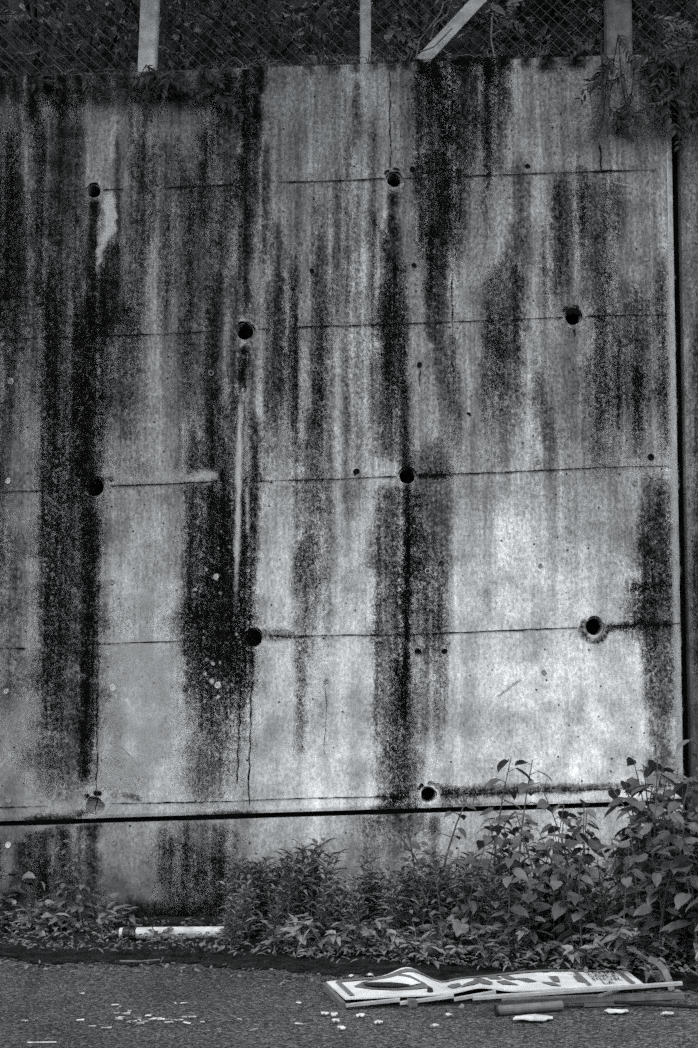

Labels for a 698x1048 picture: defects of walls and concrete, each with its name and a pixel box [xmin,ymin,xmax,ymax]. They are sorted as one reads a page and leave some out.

damp [0,58,512,870]
damp [481,165,683,789]
damp [10,823,102,901]